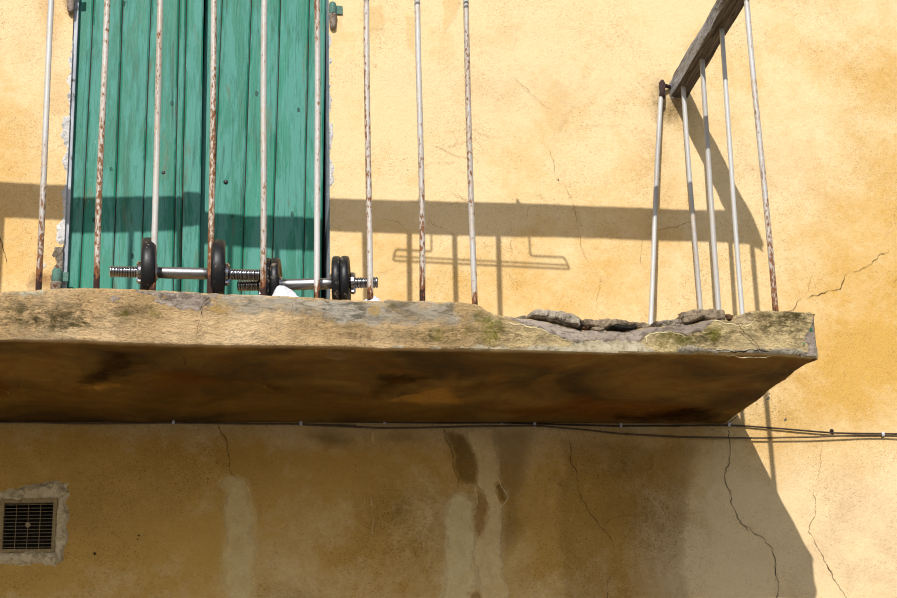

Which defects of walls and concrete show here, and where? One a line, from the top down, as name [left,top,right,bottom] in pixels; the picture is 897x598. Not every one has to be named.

spalling [460,309,817,358]
leakage [468,430,508,598]
crack [724,416,779,598]
crack [808,492,846,597]